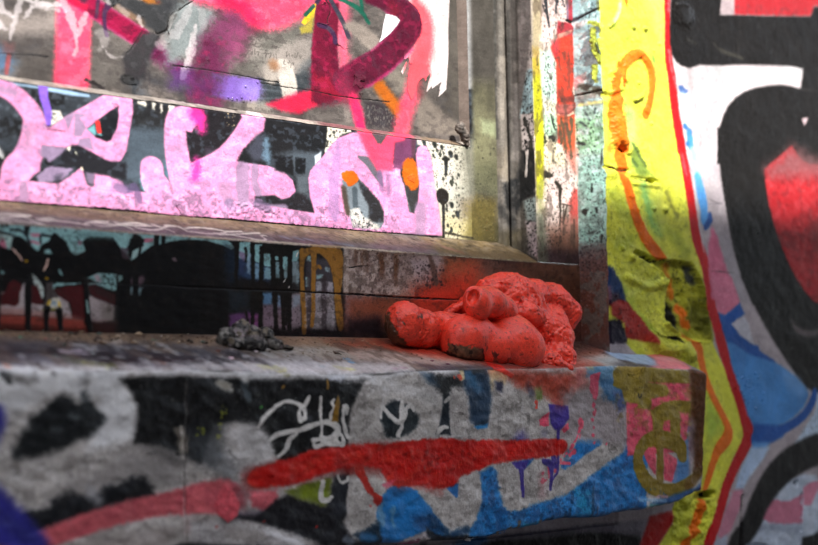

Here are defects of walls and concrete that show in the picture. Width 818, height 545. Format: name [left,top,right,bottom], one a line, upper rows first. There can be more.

crack [126,0,194,53]